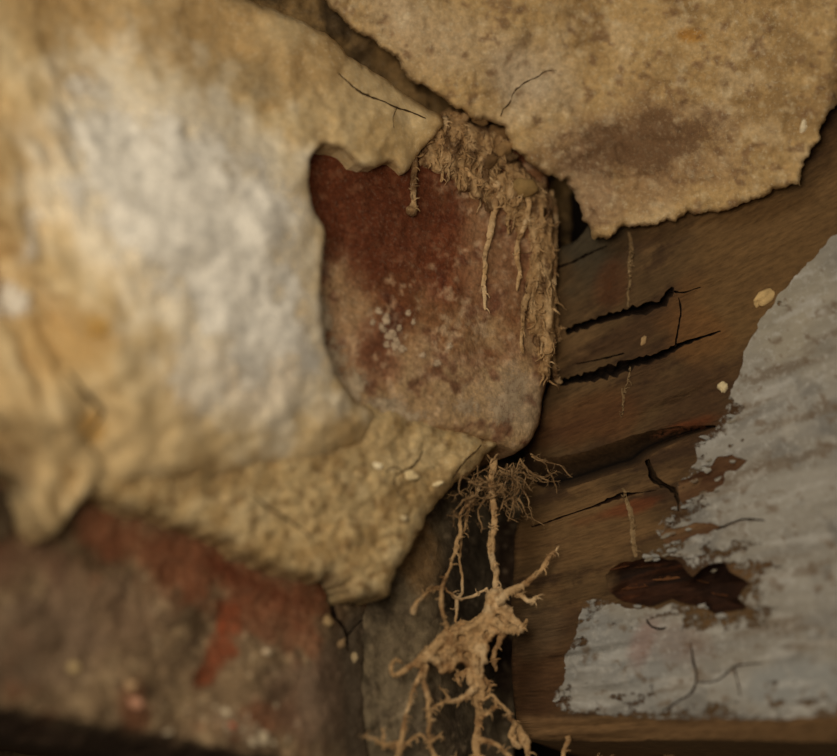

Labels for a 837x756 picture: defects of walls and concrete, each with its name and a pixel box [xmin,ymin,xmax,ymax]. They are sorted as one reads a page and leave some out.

crack [338,73,426,127]
crack [500,70,557,117]
crack [560,287,721,386]
crack [515,425,716,527]
crack [679,518,765,536]
crack [329,604,363,651]